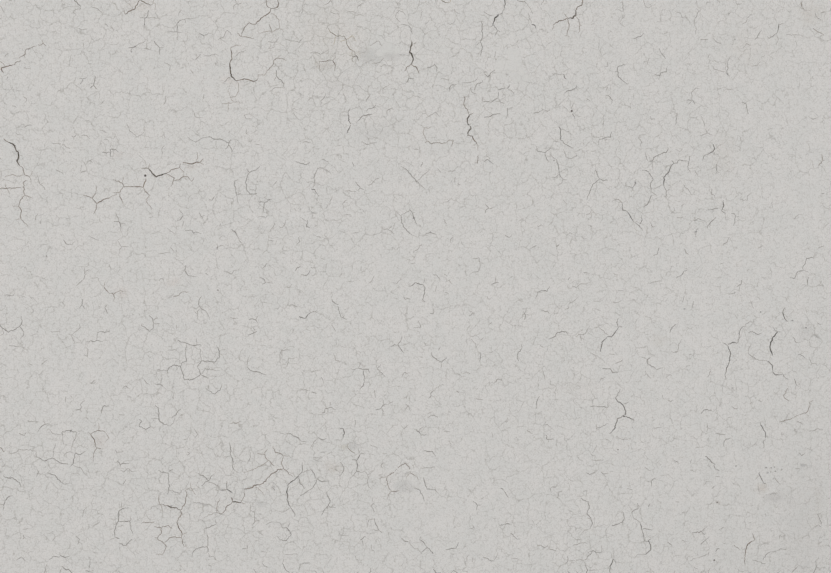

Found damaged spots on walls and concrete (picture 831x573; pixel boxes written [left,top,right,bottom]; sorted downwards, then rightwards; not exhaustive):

crack [0,0,584,573]
crack [401,271,823,573]
crack [533,0,752,308]
crack [675,0,825,115]
crack [789,245,824,287]